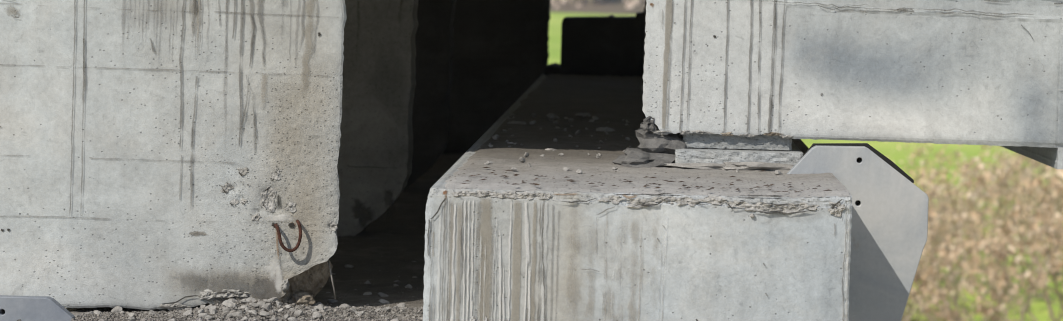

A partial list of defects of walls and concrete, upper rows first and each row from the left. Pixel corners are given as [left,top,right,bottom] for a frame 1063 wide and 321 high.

damp [179,0,202,199]
damp [232,0,265,148]
damp [301,0,316,86]
spalling [221,166,296,221]
spalling [452,190,846,220]
spalling [278,259,333,307]
damp [429,196,554,321]